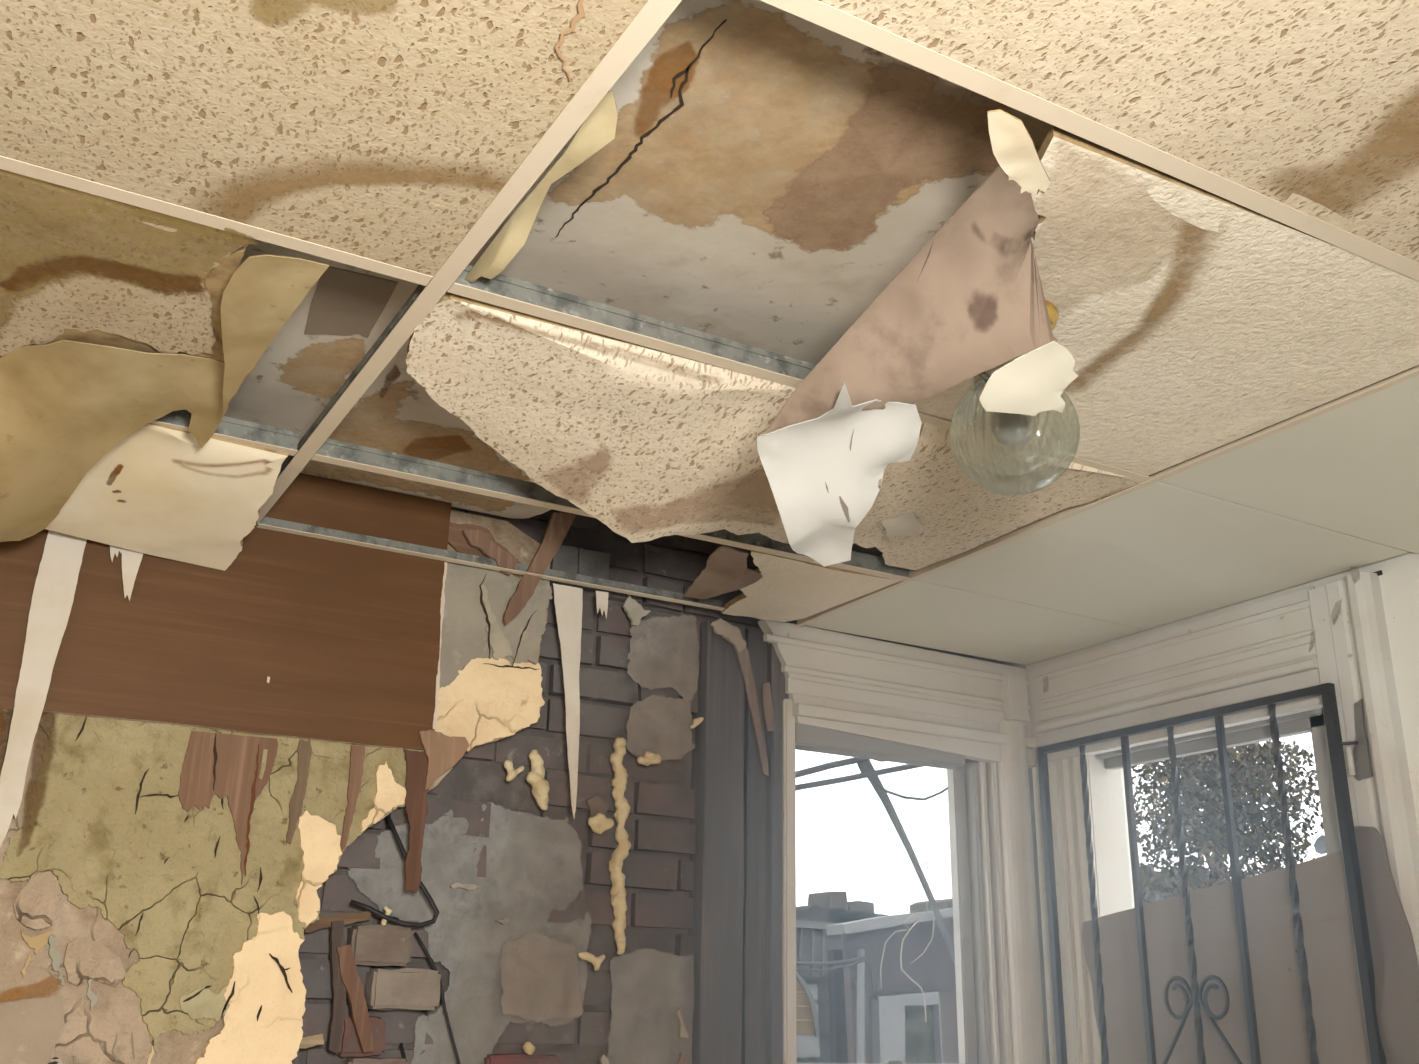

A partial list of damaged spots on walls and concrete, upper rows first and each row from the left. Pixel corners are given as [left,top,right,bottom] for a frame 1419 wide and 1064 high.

damp [253,0,393,24]
crack [555,19,727,238]
damp [549,0,1008,252]
damp [1290,94,1419,213]
damp [0,165,505,328]
peeling [435,562,553,752]
peeling [622,594,650,626]
crack [135,769,189,822]
peeling [586,796,609,817]
peeling [0,713,425,1064]
crack [254,867,263,914]
crack [183,953,293,1021]